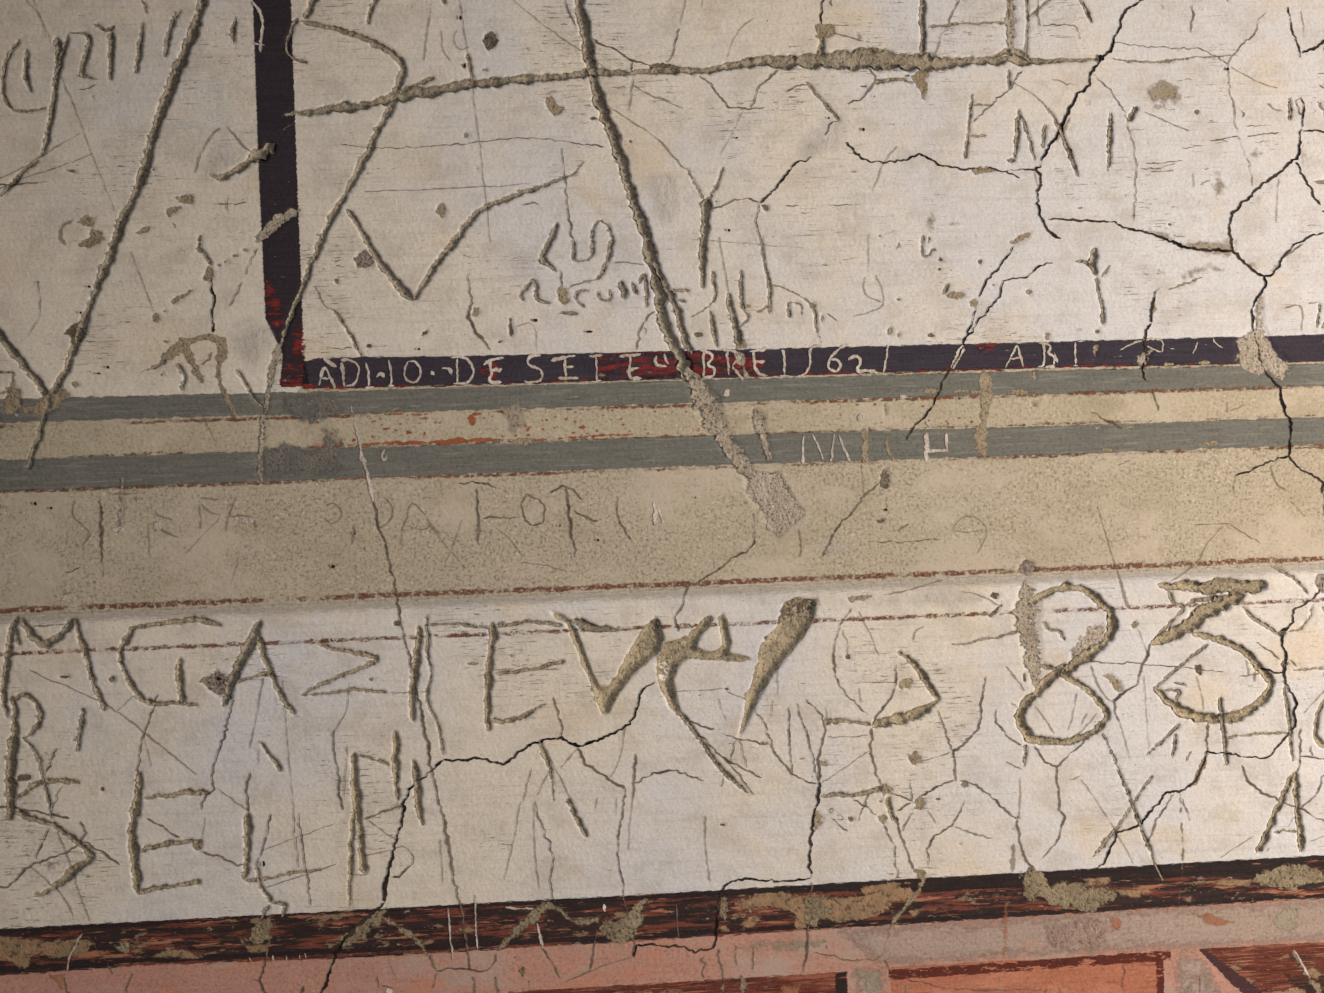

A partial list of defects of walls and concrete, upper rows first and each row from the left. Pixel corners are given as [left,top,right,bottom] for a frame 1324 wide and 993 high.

crack [700,0,1324,493]
crack [301,666,898,993]
crack [675,516,756,631]
crack [1091,565,1324,868]